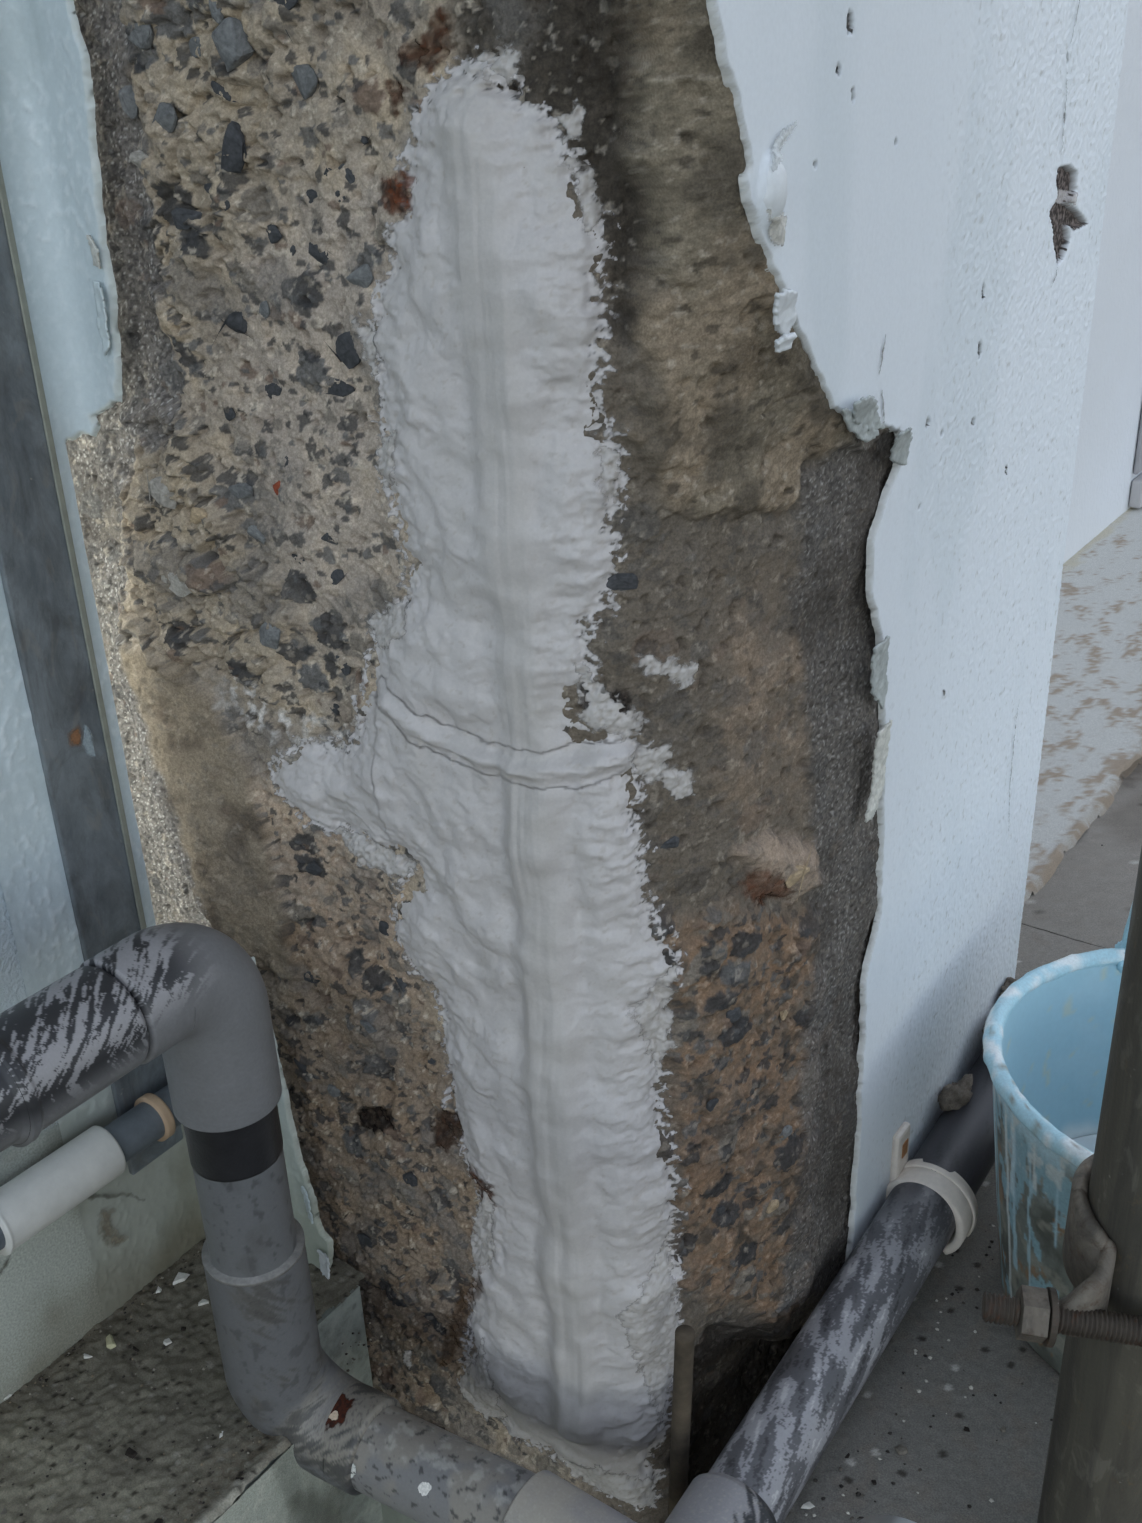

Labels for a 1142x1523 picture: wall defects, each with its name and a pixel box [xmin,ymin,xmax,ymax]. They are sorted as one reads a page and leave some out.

rust [380,170,414,214]
peeling [1049,167,1089,282]
spalling [66,0,930,1523]